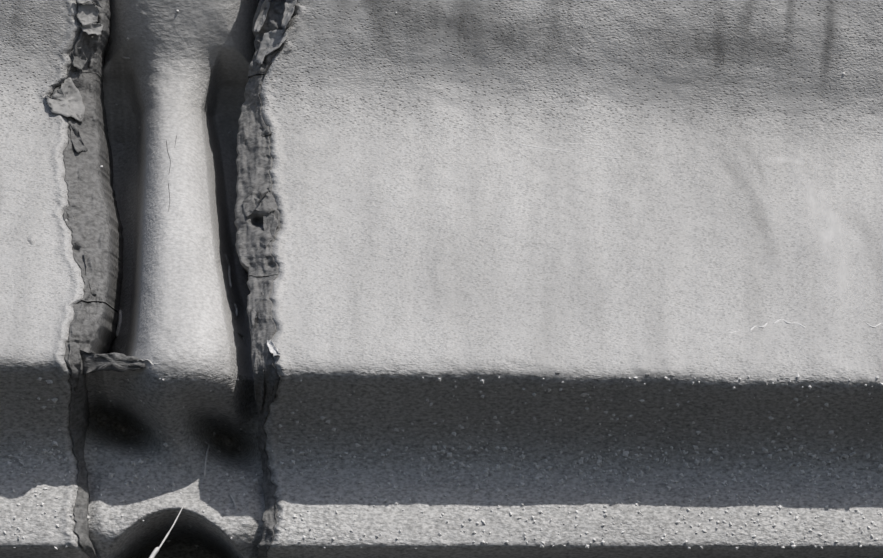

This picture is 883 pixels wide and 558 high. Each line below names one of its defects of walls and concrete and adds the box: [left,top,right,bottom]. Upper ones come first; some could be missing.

spalling [45,0,145,558]
spalling [234,0,297,558]